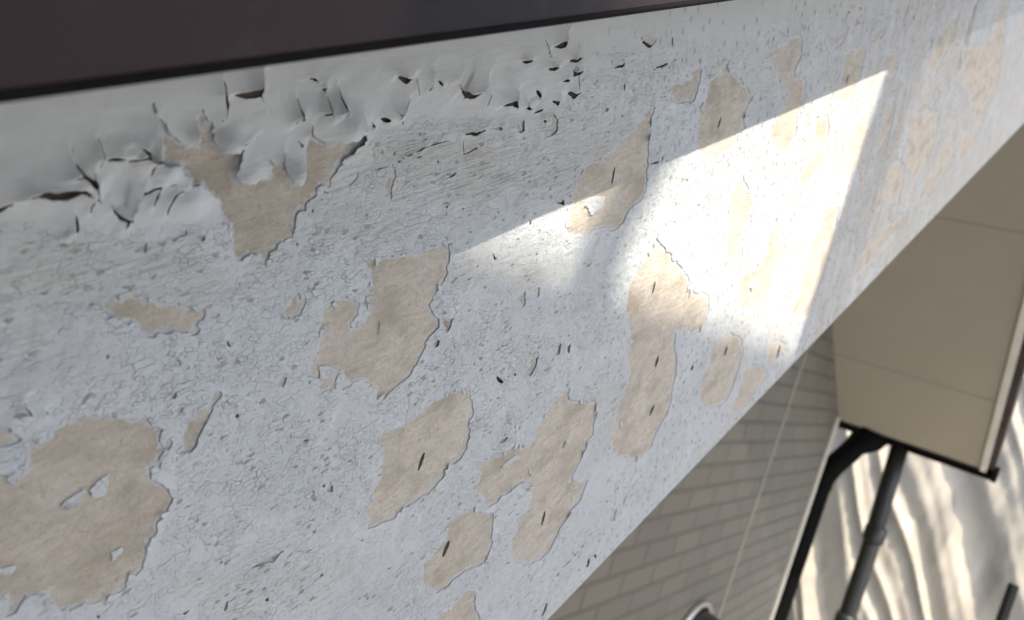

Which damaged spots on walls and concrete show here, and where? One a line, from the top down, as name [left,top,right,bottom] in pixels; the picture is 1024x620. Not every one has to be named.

peeling [150,102,368,265]
peeling [543,114,558,136]
peeling [566,105,655,238]
peeling [667,63,752,162]
peeling [86,295,205,338]
peeling [308,241,453,401]
peeling [610,239,709,462]
peeling [699,332,786,414]
peeling [0,391,222,617]
peeling [365,388,474,529]
peeling [422,392,598,593]
peeling [437,591,481,620]